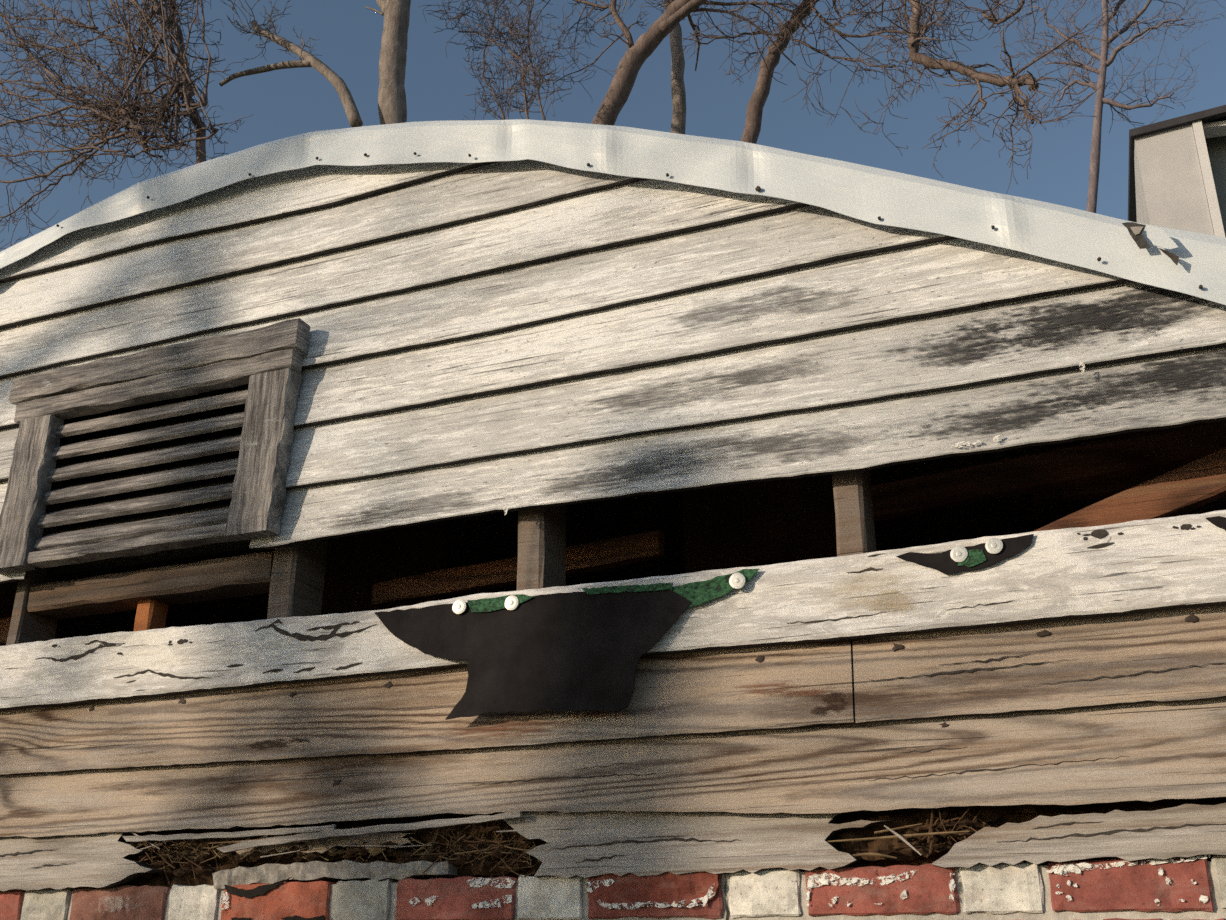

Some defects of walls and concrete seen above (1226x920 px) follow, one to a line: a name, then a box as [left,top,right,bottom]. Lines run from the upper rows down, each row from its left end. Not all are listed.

water stain [677,285,860,337]
mould [881,287,1217,367]
water stain [540,350,1226,494]
crack [37,640,124,662]
crack [113,619,376,683]
spalling [212,860,458,920]
peeling [471,895,512,909]